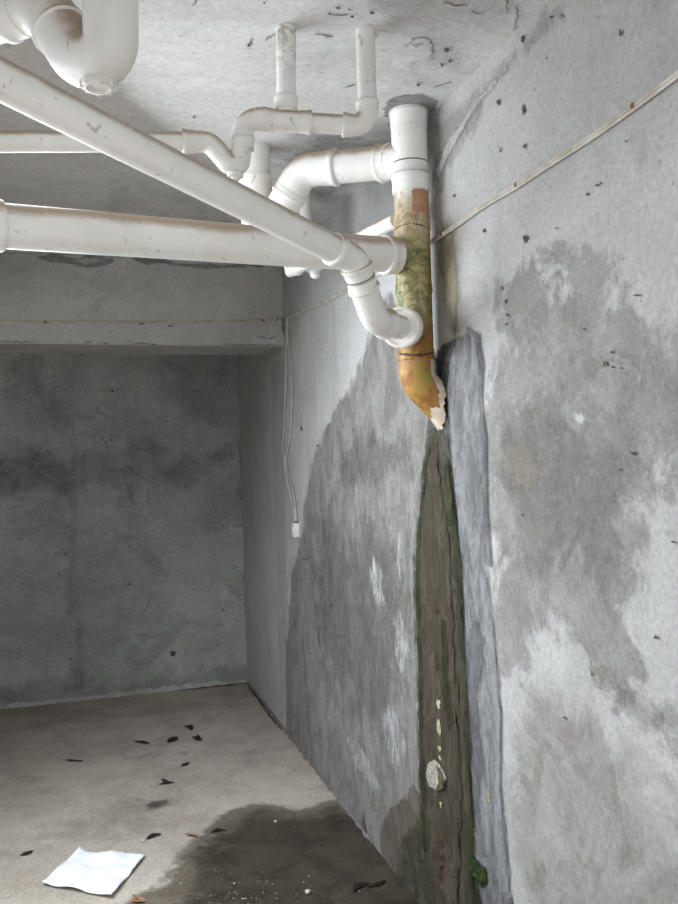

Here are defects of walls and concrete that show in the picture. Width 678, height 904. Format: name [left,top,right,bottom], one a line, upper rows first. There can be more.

crack [505,0,519,31]
crack [406,37,434,58]
damp [39,253,114,267]
damp [133,257,263,269]
damp [127,261,678,904]